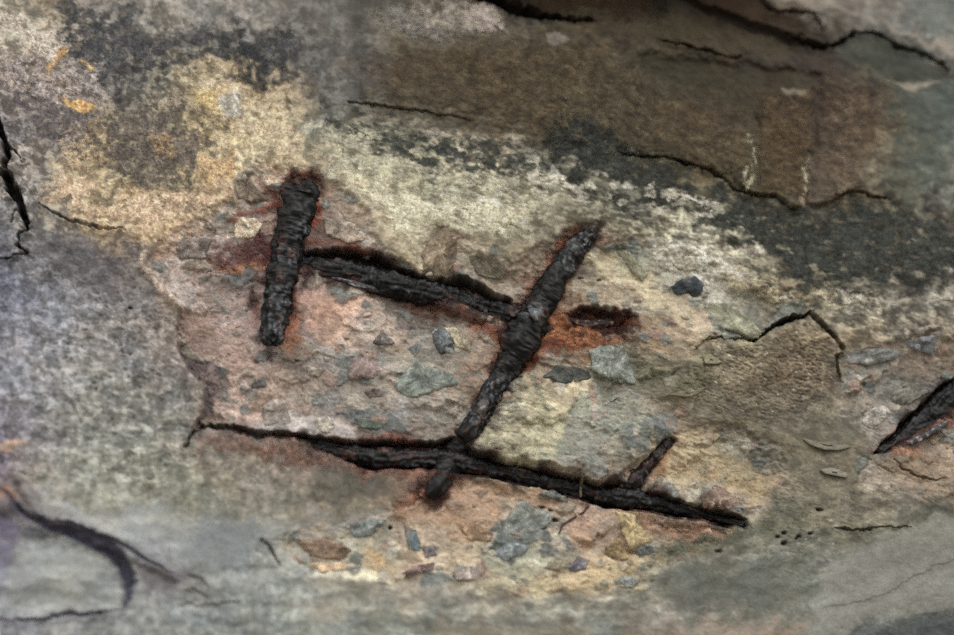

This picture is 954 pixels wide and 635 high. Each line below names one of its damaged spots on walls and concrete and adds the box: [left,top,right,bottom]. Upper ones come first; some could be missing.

crack [477,0,596,24]
crack [658,0,950,74]
crack [0,117,127,260]
crack [622,152,798,211]
rust [208,232,272,309]
rust [327,242,424,279]
spalling [147,162,817,599]
rust [523,266,644,371]
crack [693,309,846,381]
rust [210,428,485,510]
rust [358,432,514,464]
crack [0,488,241,624]